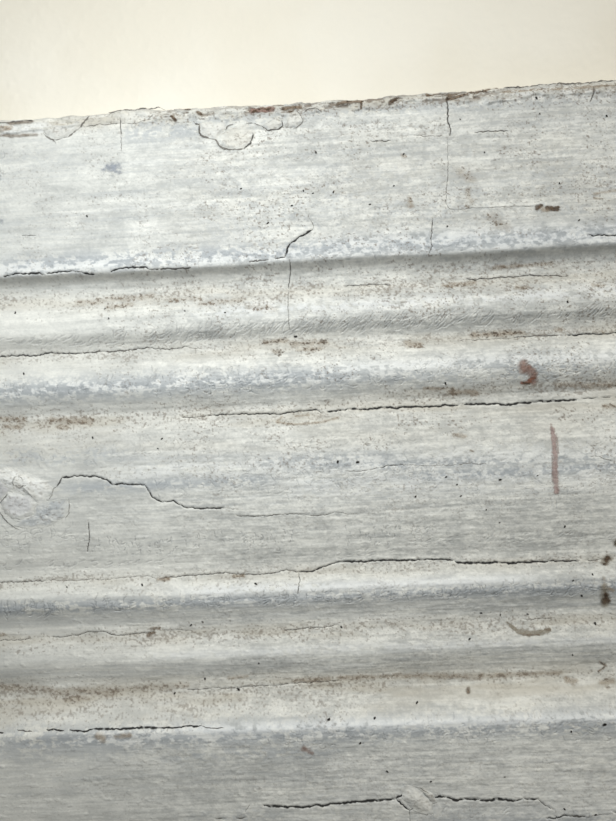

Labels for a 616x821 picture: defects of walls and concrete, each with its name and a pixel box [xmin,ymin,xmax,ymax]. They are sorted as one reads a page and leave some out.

peeling [185,105,320,150]
crack [372,101,530,210]
crack [4,266,191,277]
crack [249,215,314,324]
crack [0,346,200,357]
corrosion [520,360,537,384]
crack [183,397,607,418]
crack [57,475,346,517]
crack [0,558,598,591]
crack [0,725,223,734]
crack [435,795,616,819]